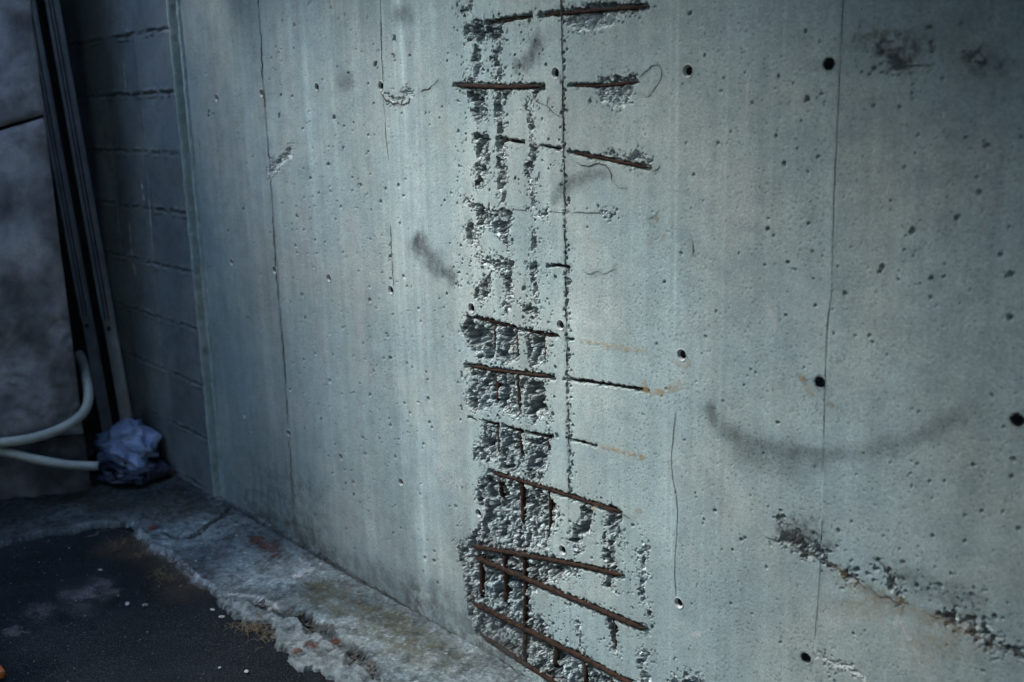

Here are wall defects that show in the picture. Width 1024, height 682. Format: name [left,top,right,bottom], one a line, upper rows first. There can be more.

spalling [562,0,646,34]
spalling [595,72,639,110]
rust [545,145,652,169]
crack [825,5,843,360]
crack [533,0,629,518]
crack [168,0,458,635]
spalling [456,2,623,682]
rust [468,364,555,408]
rust [571,378,679,394]
rust [492,470,623,535]
spalling [776,528,864,591]
rust [471,545,647,682]